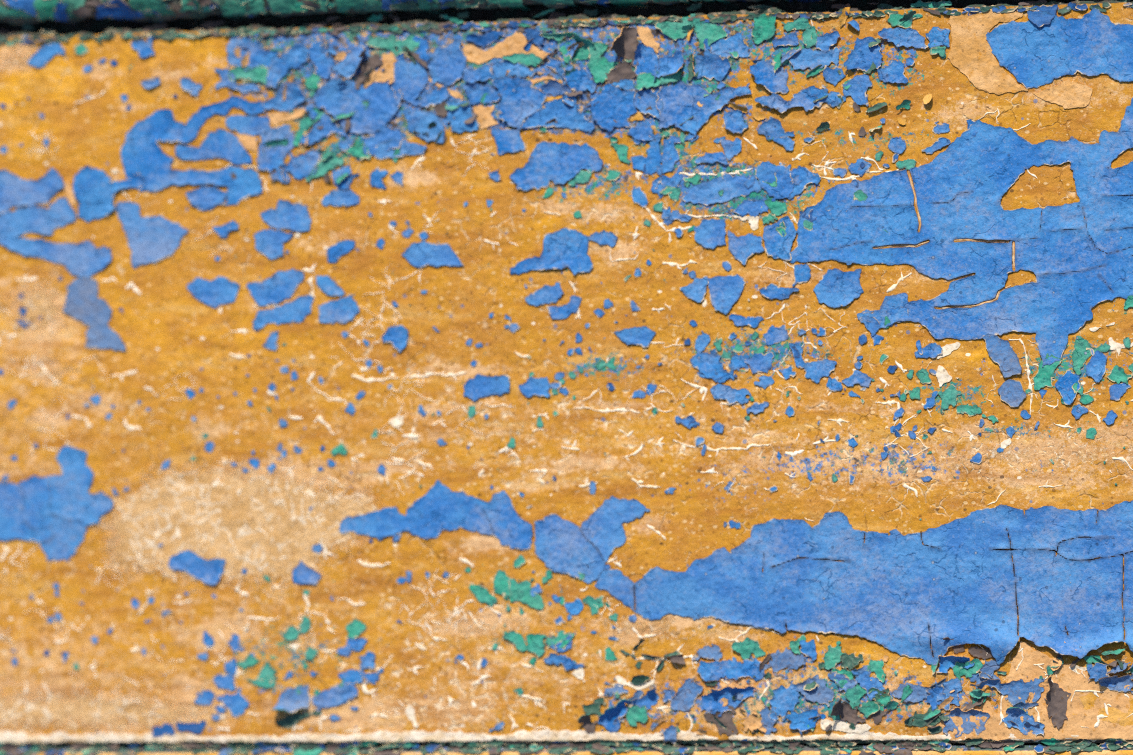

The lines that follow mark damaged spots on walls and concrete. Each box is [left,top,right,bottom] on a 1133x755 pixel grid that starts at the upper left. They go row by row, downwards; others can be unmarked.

peeling [0,0,1133,482]
crack [609,203,731,269]
crack [792,131,1015,309]
peeling [0,445,130,561]
crack [0,432,390,733]
crack [267,264,581,495]
crack [293,557,570,733]
peeling [0,480,1133,755]
crack [577,378,848,492]
crack [875,360,975,457]
crack [1009,339,1111,428]
crack [994,511,1133,728]